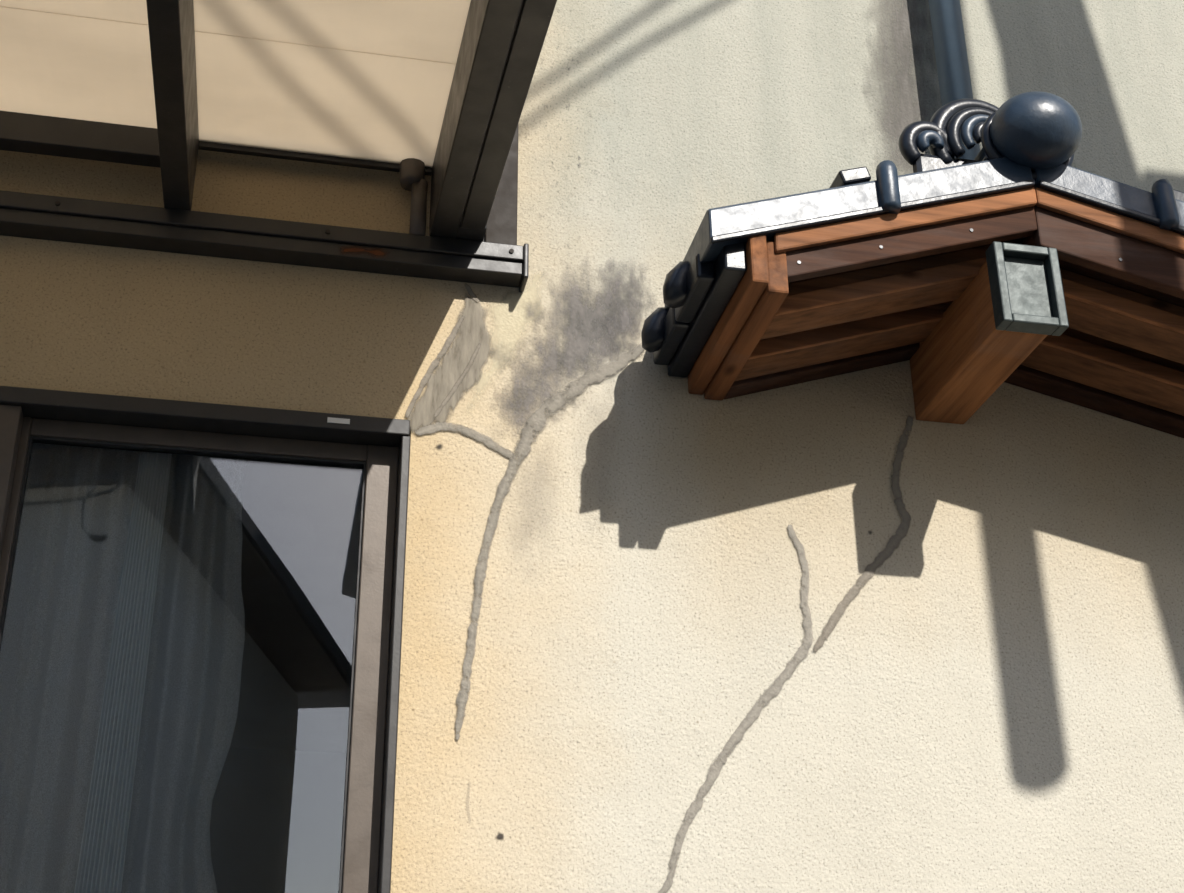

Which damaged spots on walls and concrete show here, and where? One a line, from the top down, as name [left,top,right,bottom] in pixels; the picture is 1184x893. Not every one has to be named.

crack [415,345,644,740]
crack [658,416,913,893]